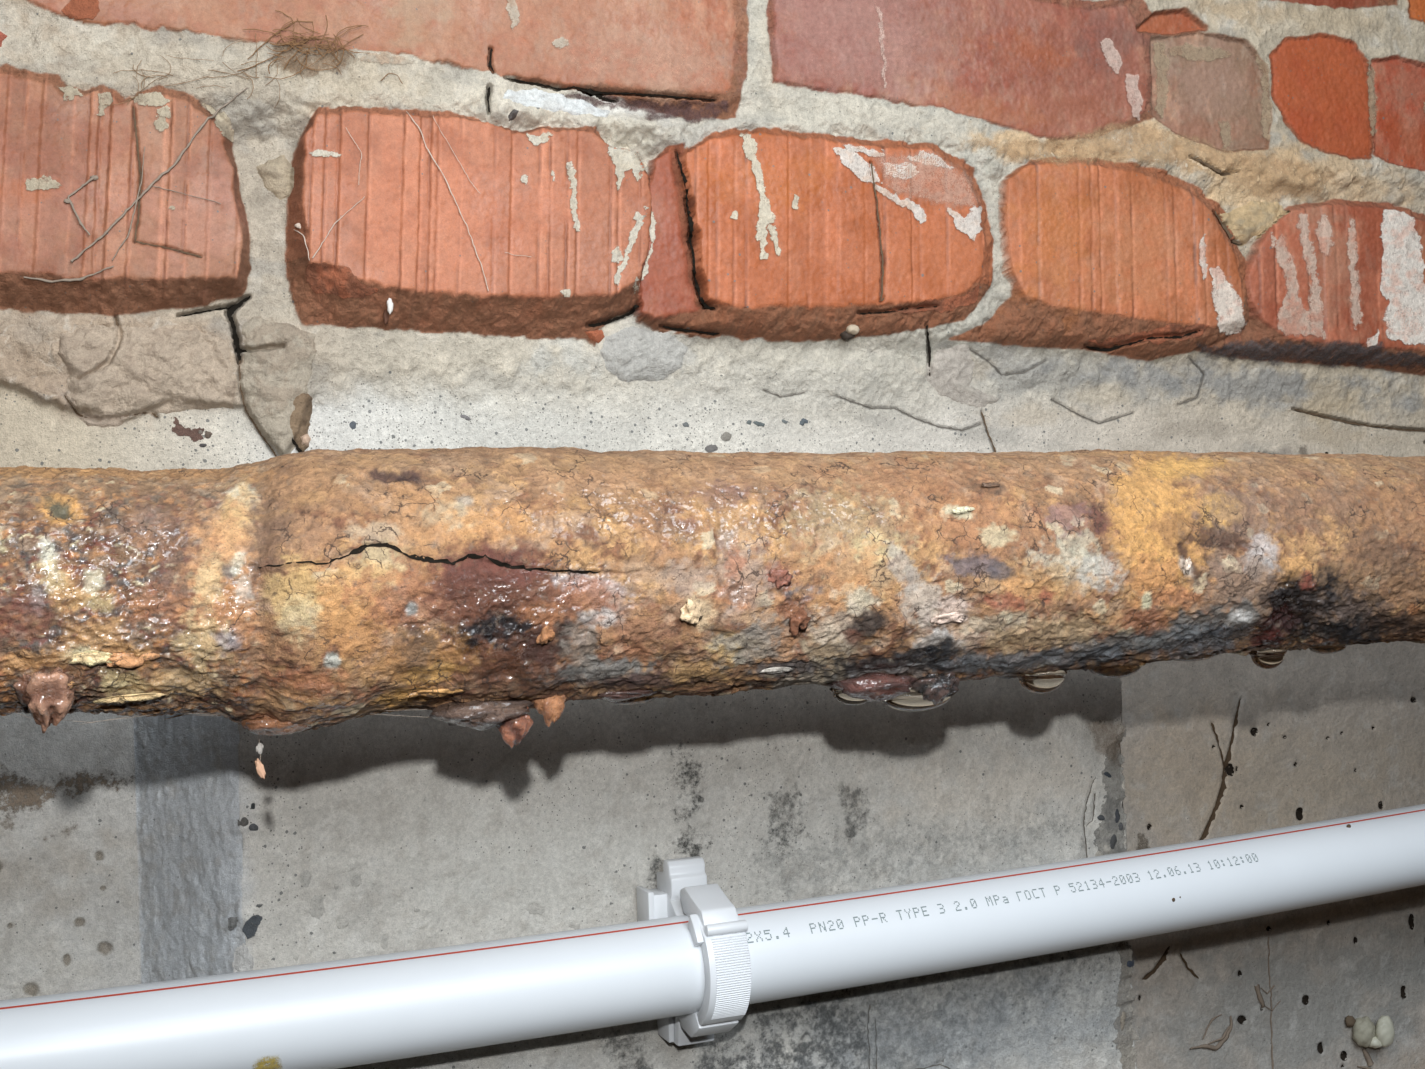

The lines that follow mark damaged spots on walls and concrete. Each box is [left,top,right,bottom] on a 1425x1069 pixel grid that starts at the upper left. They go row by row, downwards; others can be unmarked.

crack [588,151,720,335]
spalling [306,262,378,299]
crack [180,296,277,457]
spalling [171,417,212,447]
spalling [705,432,732,453]
leakage [647,744,711,887]
leakage [698,1003,865,1069]